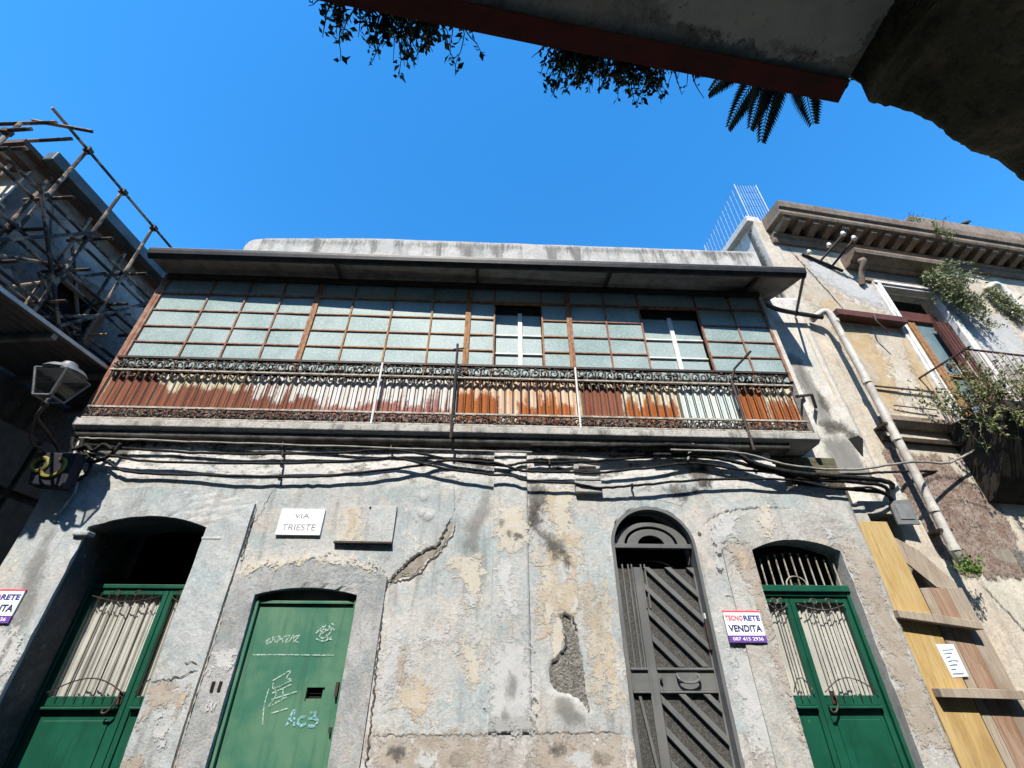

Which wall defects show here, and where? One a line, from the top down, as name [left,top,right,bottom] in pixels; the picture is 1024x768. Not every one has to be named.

rust [91,373,499,424]
rust [517,384,681,428]
rust [735,388,804,431]
peeling [242,506,387,580]
damp [528,484,570,566]
crack [364,499,488,768]
peeling [362,481,634,768]